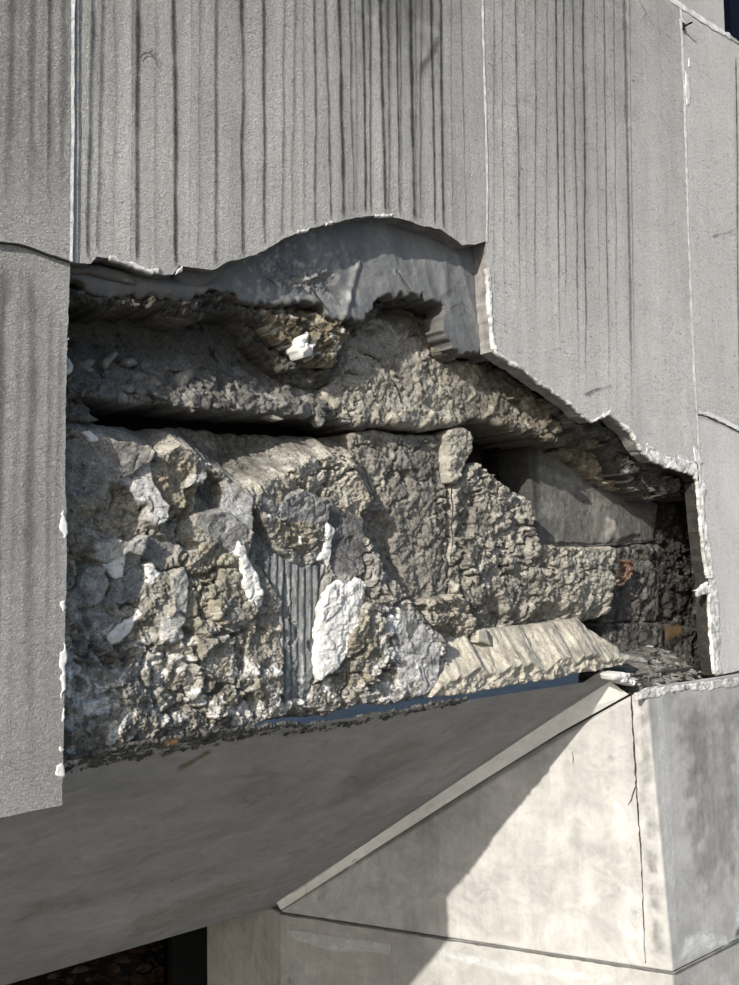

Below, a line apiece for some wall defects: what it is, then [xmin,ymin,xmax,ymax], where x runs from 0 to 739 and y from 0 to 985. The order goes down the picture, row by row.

spalling [55,213,739,777]
crack [280,686,739,975]